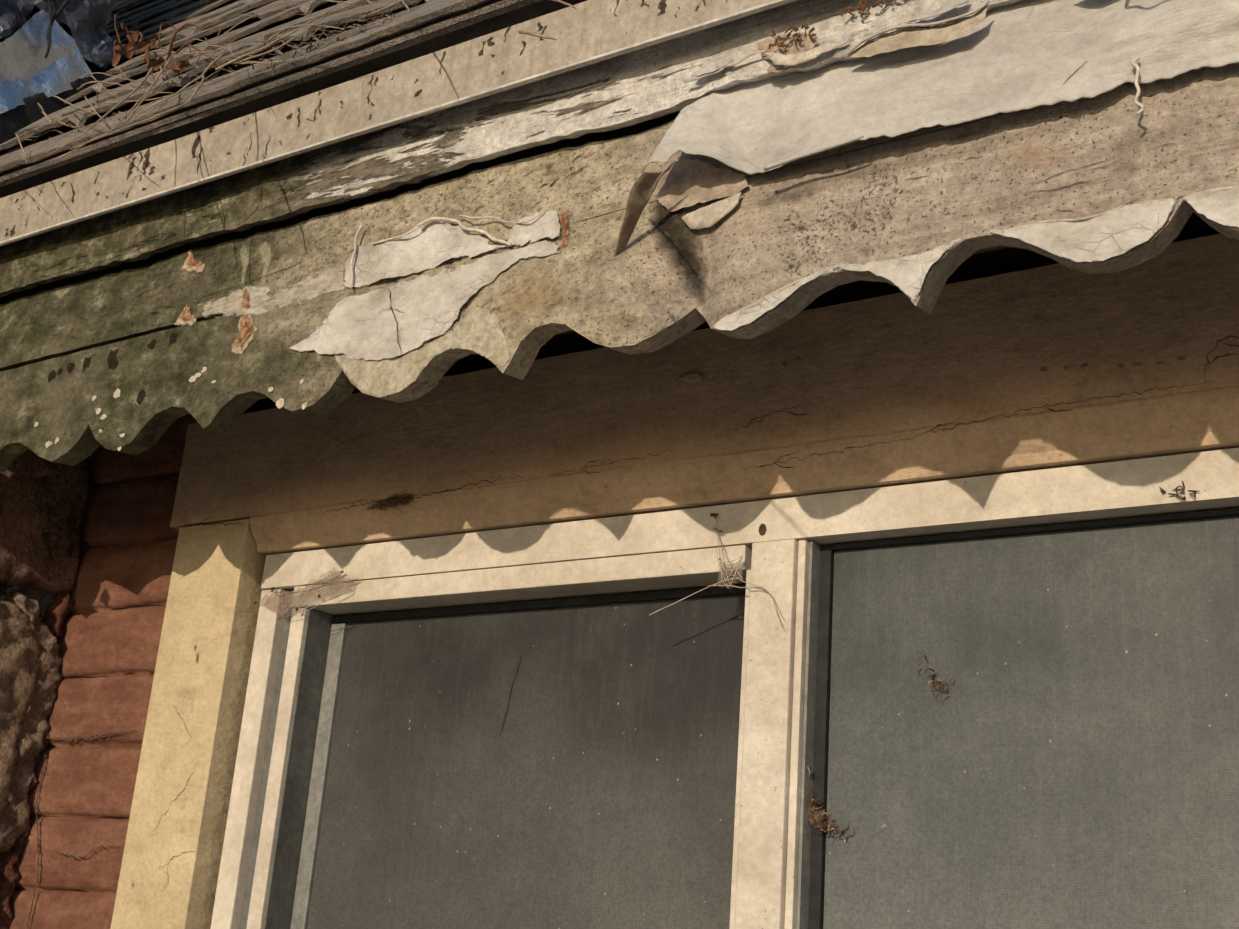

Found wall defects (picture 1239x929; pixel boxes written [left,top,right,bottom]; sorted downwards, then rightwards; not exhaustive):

peeling [614,0,1239,262]
damp [48,357,91,382]
damp [107,349,118,369]
damp [147,333,177,350]
rust [174,304,197,326]
rust [182,250,204,272]
rust [231,289,257,354]
damp [241,243,270,285]
peeling [199,210,560,396]
peeling [712,239,960,331]
crack [743,336,1239,470]
crack [310,449,675,516]